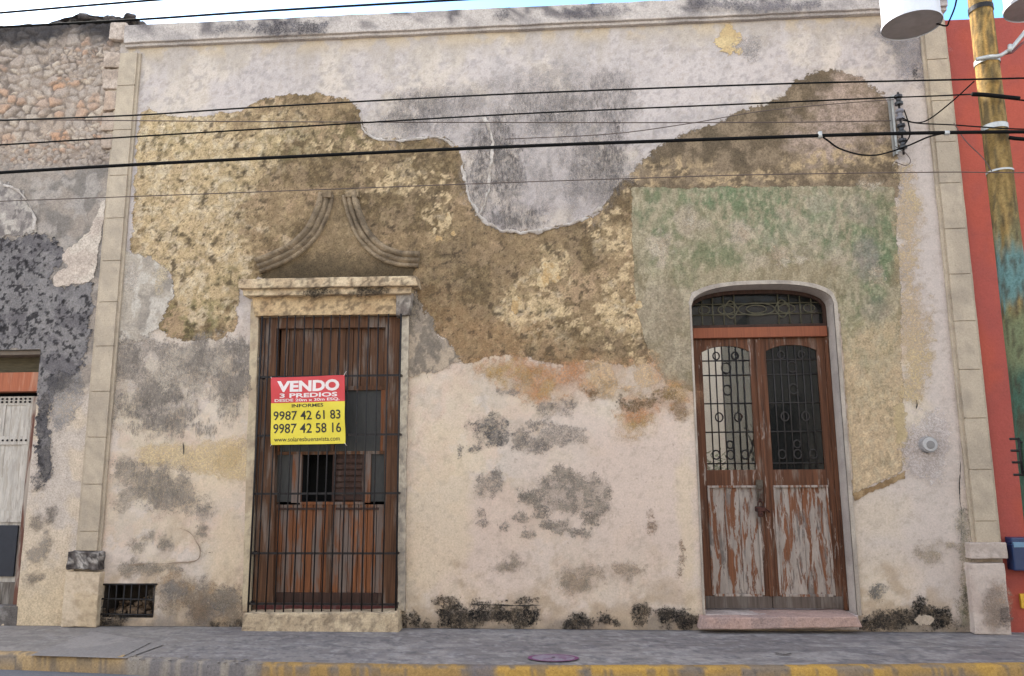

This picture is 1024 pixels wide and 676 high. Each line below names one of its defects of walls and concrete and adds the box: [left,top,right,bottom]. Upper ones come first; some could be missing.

peeling [713,24,760,60]
peeling [53,200,105,287]
peeling [432,212,457,242]
peeling [536,261,561,287]
peeling [408,290,461,402]
peeling [631,165,936,501]
damp [112,329,259,445]
damp [458,389,599,456]
damp [474,464,612,538]
damp [402,595,541,629]
damp [630,602,699,630]
damp [859,583,969,632]